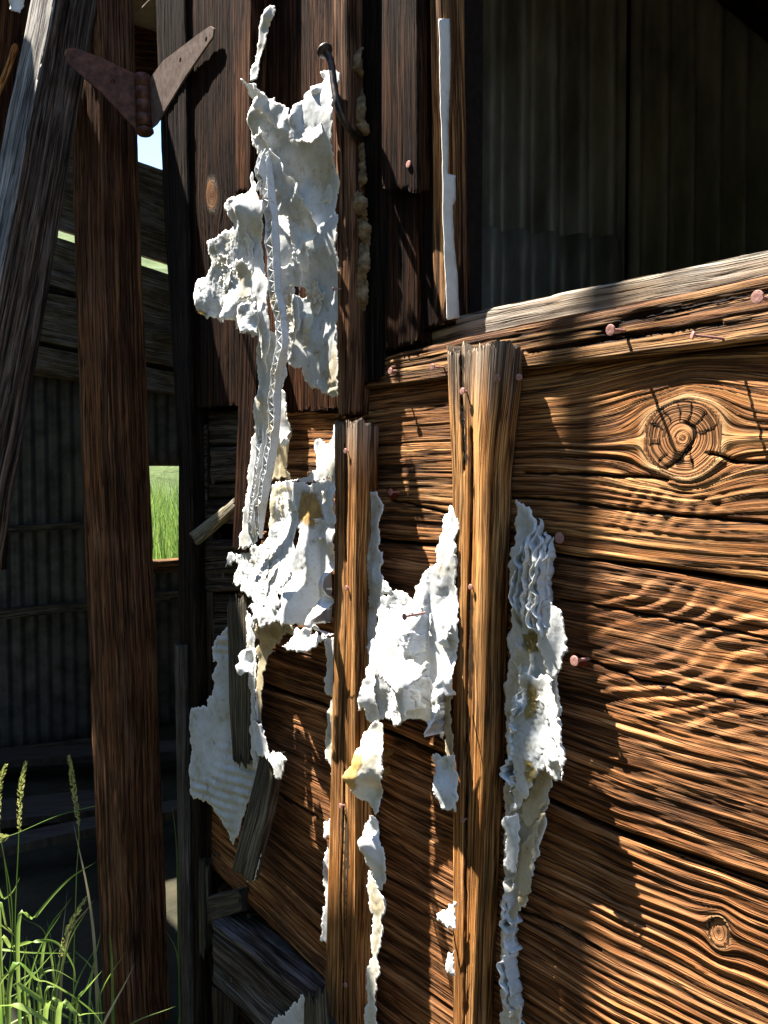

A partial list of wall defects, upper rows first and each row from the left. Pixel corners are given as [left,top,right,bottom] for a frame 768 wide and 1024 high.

peeling [438,19,460,320]
crack [511,403,768,523]